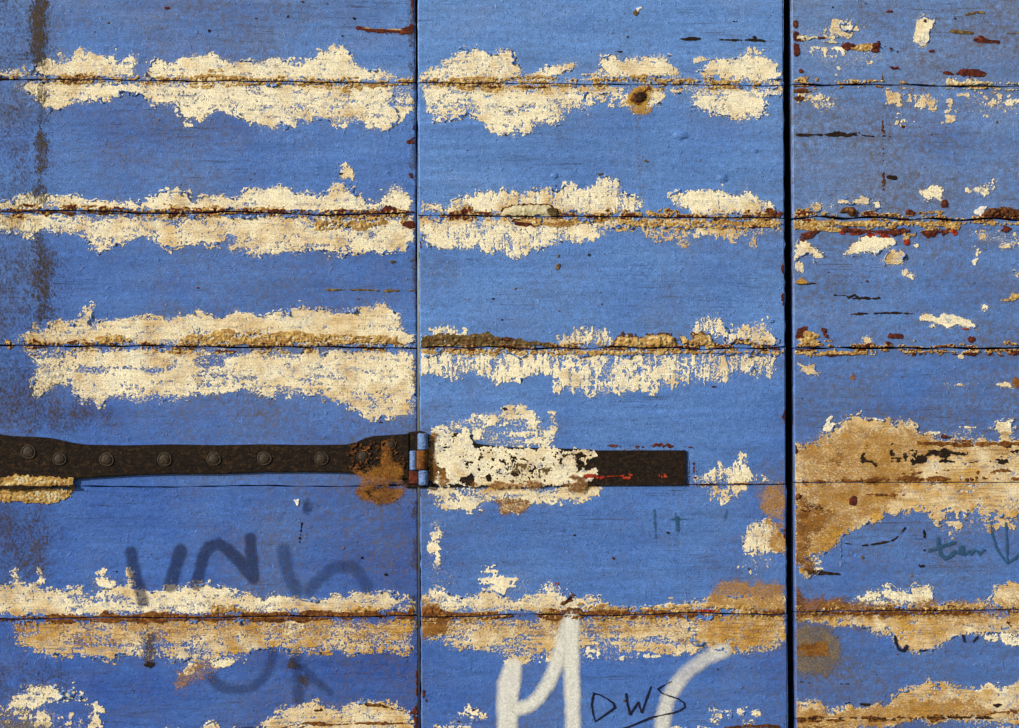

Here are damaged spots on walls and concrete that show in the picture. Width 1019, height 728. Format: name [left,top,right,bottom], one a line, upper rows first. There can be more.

corrosion [406,0,414,89]
peeling [0,6,1019,191]
corrosion [626,86,652,114]
peeling [0,162,1019,280]
peeling [4,298,1019,423]
corrosion [344,438,408,506]
peeling [0,403,1019,676]
peeling [0,682,105,728]
peeling [257,698,418,728]
corrosion [410,670,418,728]
peeling [671,706,780,728]
peeling [797,678,1019,728]